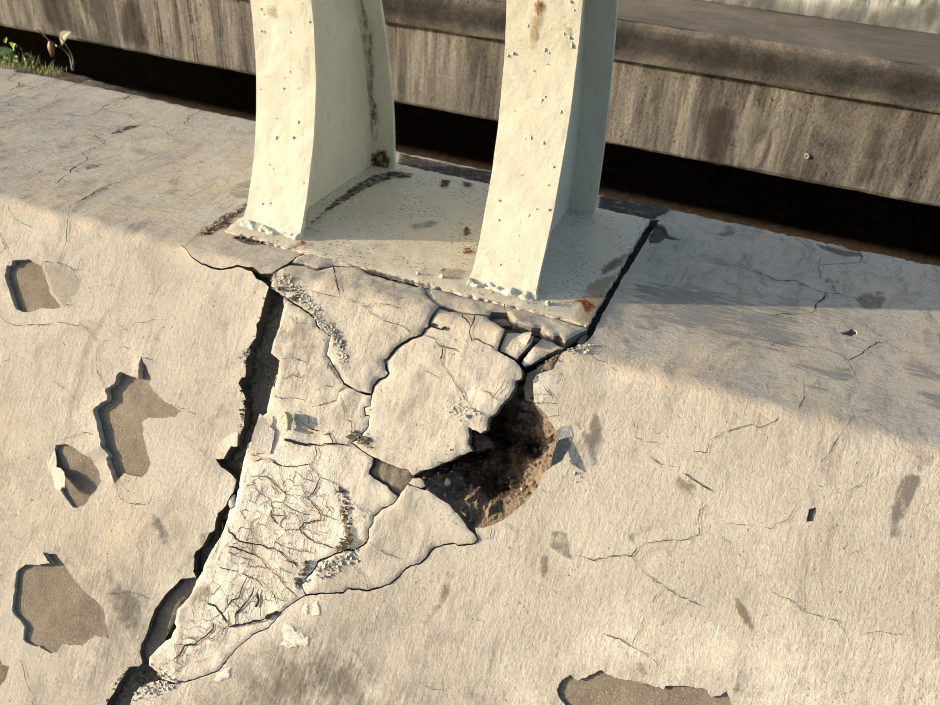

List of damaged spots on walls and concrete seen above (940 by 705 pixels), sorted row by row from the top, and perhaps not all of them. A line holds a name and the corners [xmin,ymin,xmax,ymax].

rust [530,1,543,48]
crack [40,182,119,284]
peeling [5,259,61,312]
rust [573,254,628,322]
peeling [55,357,181,508]
crack [114,255,505,705]
spalling [105,245,597,705]
crack [695,412,779,453]
crack [575,424,713,665]
crack [722,416,903,648]
peeling [12,553,110,653]
peeling [557,670,731,705]